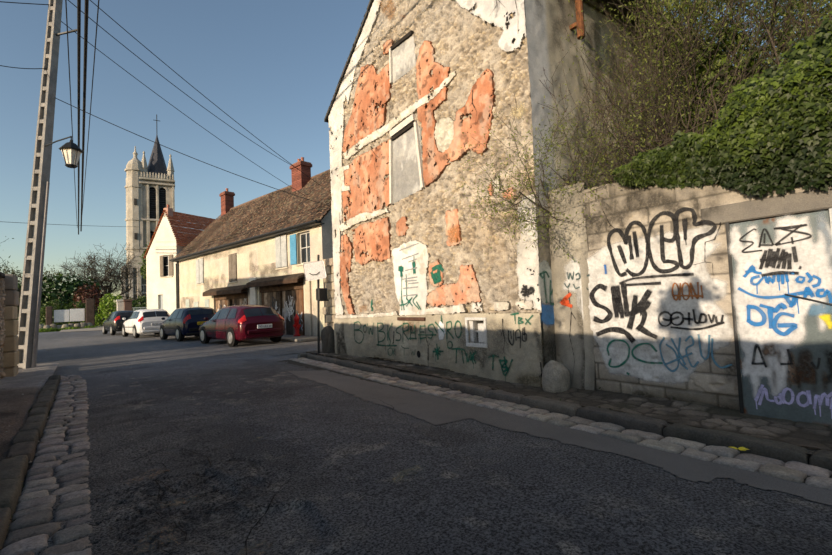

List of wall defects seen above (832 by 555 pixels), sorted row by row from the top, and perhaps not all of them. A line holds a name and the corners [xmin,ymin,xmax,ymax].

spalling [328,0,542,319]
corrosion [786,350,832,388]